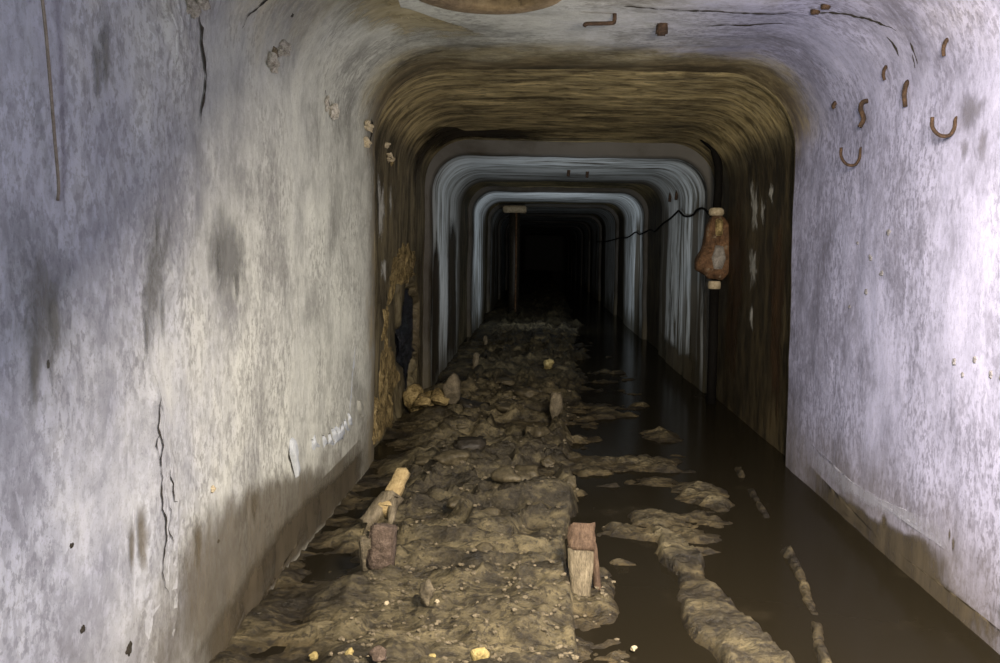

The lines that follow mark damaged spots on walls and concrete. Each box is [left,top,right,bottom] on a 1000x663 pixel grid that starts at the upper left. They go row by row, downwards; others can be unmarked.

peeling [378,182,392,233]
spalling [372,243,416,445]
water stain [130,514,147,564]
crack [155,376,178,589]
water stain [178,445,360,657]
water stain [815,475,994,643]